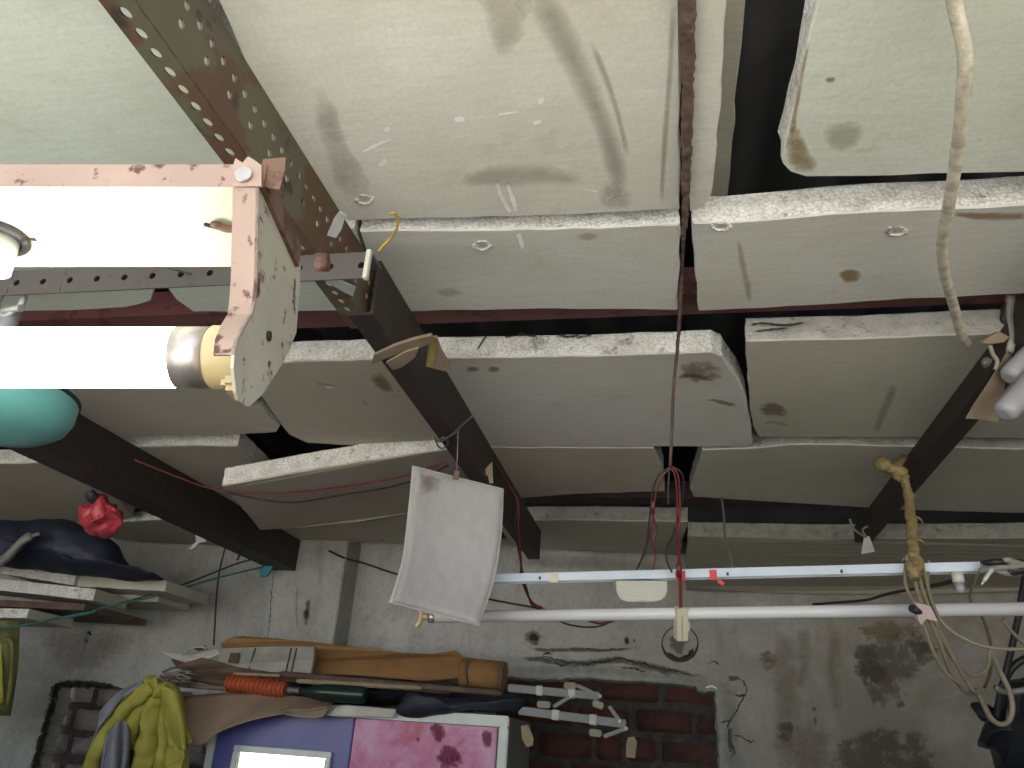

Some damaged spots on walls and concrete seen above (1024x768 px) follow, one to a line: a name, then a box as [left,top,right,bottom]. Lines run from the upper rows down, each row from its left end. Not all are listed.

water stain [791,85,807,163]
water stain [842,271,857,281]
flaking render [487,674,723,768]
crack [529,647,754,758]